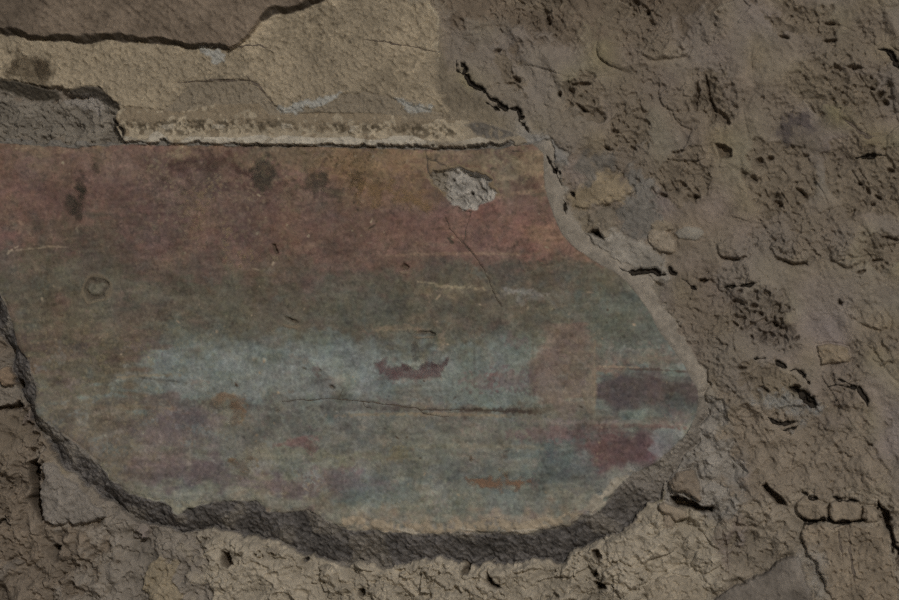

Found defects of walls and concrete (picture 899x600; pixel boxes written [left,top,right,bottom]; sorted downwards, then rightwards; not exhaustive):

crack [364,39,529,132]
spalling [425,164,500,210]
crack [287,389,514,417]